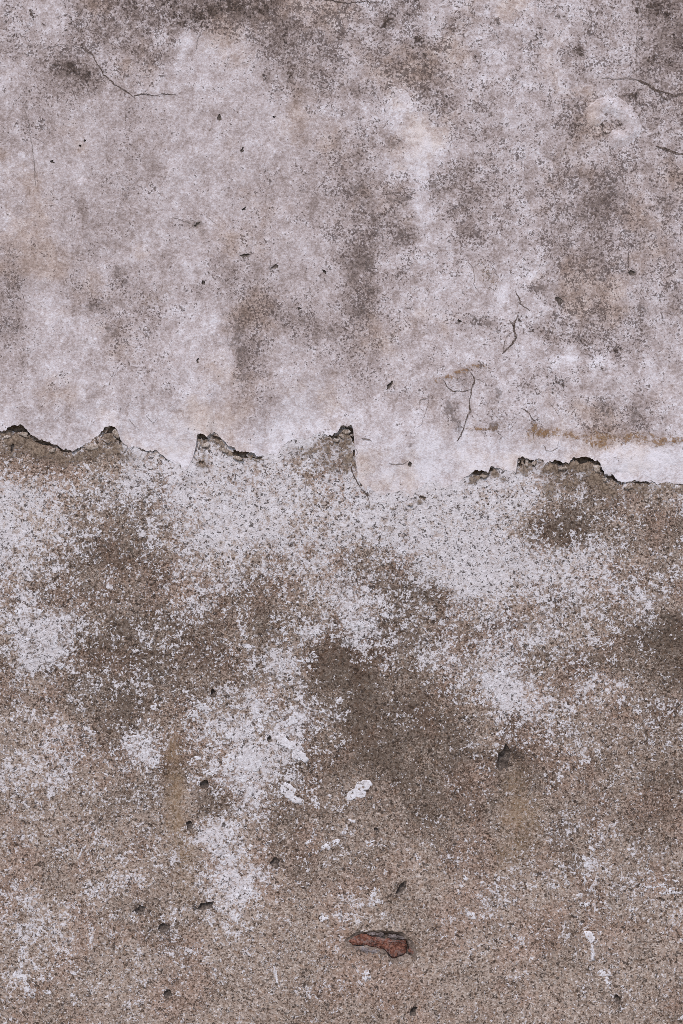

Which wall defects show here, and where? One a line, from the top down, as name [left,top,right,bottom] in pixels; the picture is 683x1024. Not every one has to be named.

leakage [162,0,290,43]
leakage [635,0,683,70]
leakage [52,57,97,86]
crack [47,44,172,96]
crack [418,368,483,441]
spalling [0,425,146,467]
spalling [196,434,264,468]
spalling [468,467,506,485]
spalling [518,457,683,504]
peeling [175,689,309,811]
peeling [346,780,372,801]
spalling [344,882,420,963]